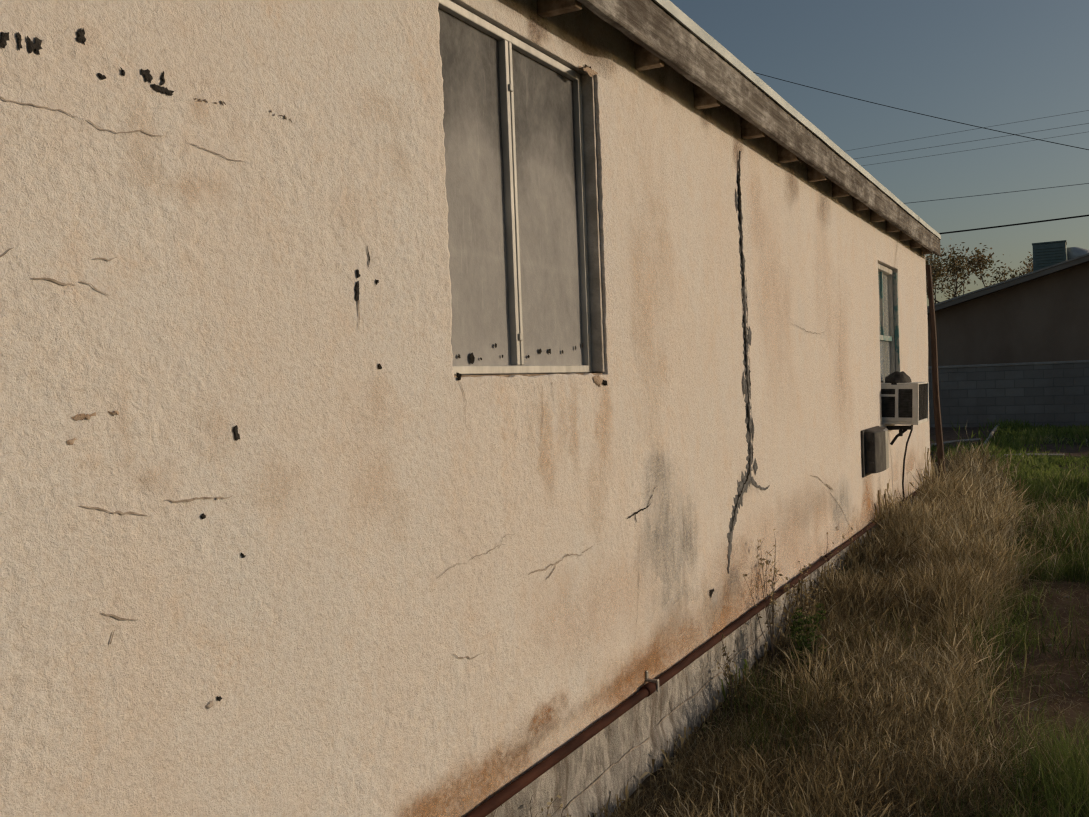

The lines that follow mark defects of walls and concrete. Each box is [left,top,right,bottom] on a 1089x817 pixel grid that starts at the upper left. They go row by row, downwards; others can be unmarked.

peeling [0,31,43,55]
peeling [76,28,86,45]
peeling [141,69,174,96]
crack [0,97,160,136]
crack [188,142,244,162]
crack [33,257,117,295]
peeling [355,246,370,329]
crack [727,151,770,583]
crack [528,546,593,579]
crack [627,488,655,638]